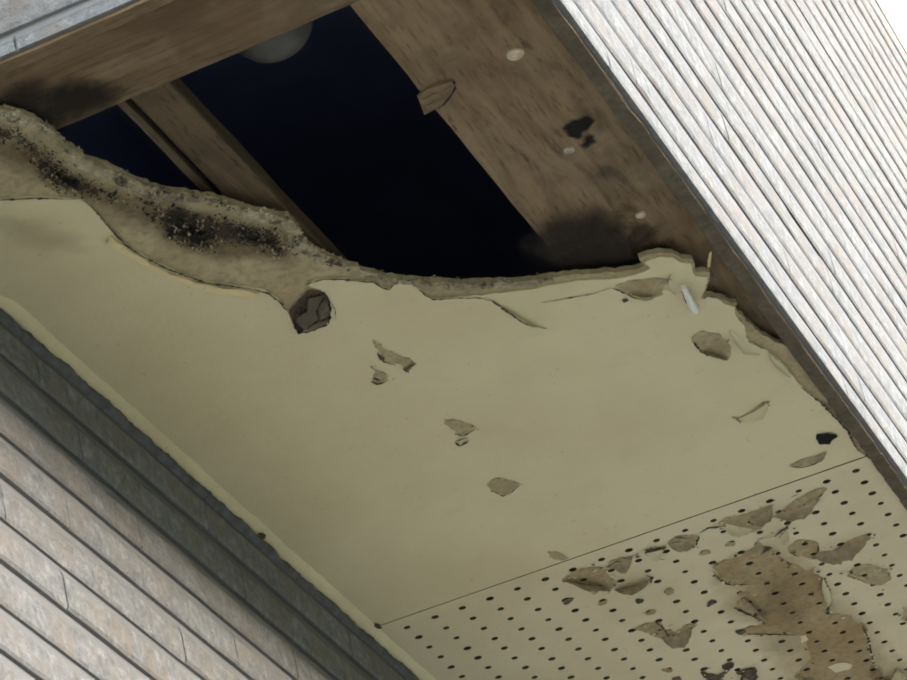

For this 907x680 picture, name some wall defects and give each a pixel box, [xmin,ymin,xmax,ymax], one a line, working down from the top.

water stain [563,117,596,148]
water stain [0,125,298,257]
water stain [529,211,650,272]
peeling [107,236,260,299]
spalling [289,290,336,334]
peeling [613,278,672,301]
peeling [370,340,417,385]
peeling [691,329,792,377]
peeling [443,419,479,447]
peeling [801,387,858,451]
peeling [487,478,522,497]
peeling [562,487,907,680]